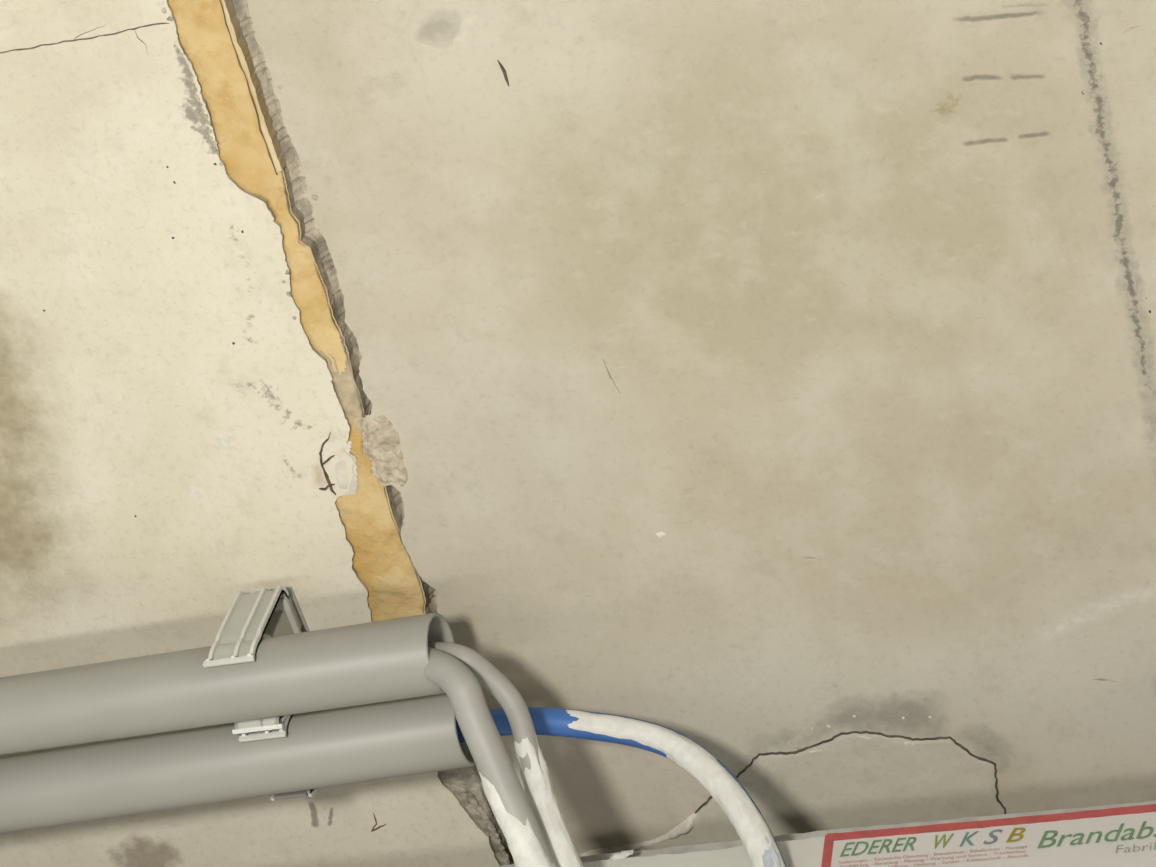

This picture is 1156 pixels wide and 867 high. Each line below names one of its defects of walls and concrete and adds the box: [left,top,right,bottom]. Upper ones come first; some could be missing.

damp [0,281,111,646]
crack [0,0,438,622]
crack [437,766,514,866]